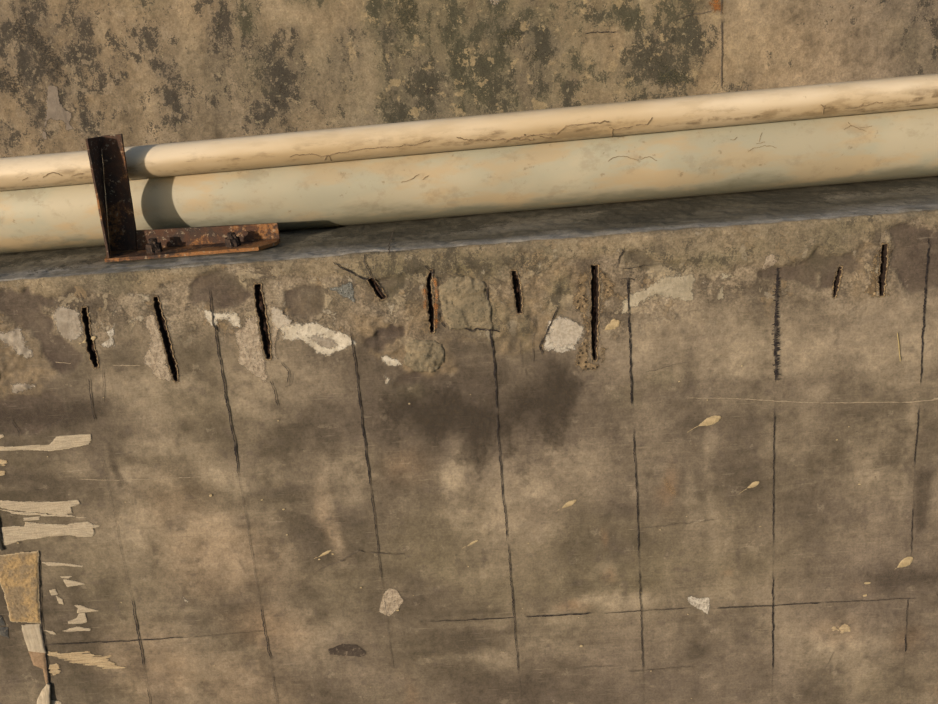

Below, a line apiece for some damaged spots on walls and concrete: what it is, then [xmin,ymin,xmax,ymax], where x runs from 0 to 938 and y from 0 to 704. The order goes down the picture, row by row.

leakage [13,13,68,83]
peeling [0,326,33,359]
peeling [53,306,82,341]
spalling [143,314,180,381]
spalling [234,316,280,383]
spalling [544,272,606,371]
peeling [600,271,696,314]
peeling [12,383,37,394]
leakage [386,371,576,463]
crack [428,250,720,704]
crack [717,239,930,704]